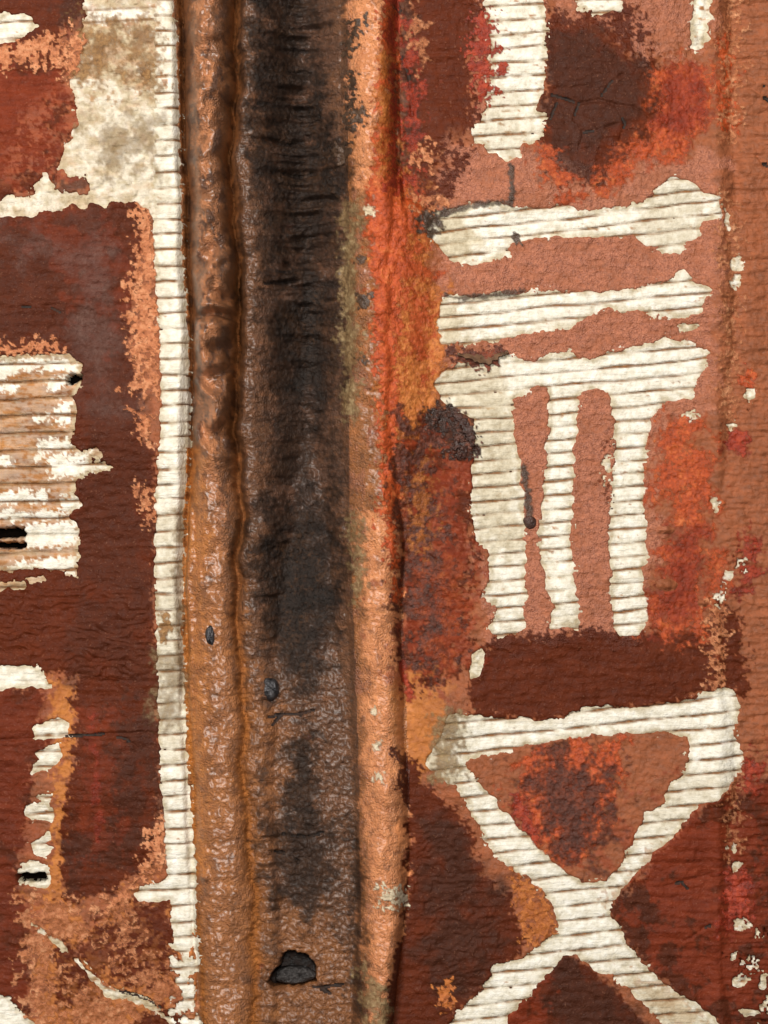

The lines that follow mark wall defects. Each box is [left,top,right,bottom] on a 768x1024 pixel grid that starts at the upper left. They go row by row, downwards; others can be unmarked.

crack [549,80,613,134]
corrosion [527,32,746,205]
peeling [685,0,754,152]
leakage [305,80,366,422]
corrosion [362,0,473,702]
peeling [0,0,203,1024]
corrosion [643,405,768,648]
leakage [285,730,320,832]
corrosion [492,734,633,880]
peeling [426,557,748,1024]
leakage [351,961,394,1024]
peeling [730,951,768,1024]